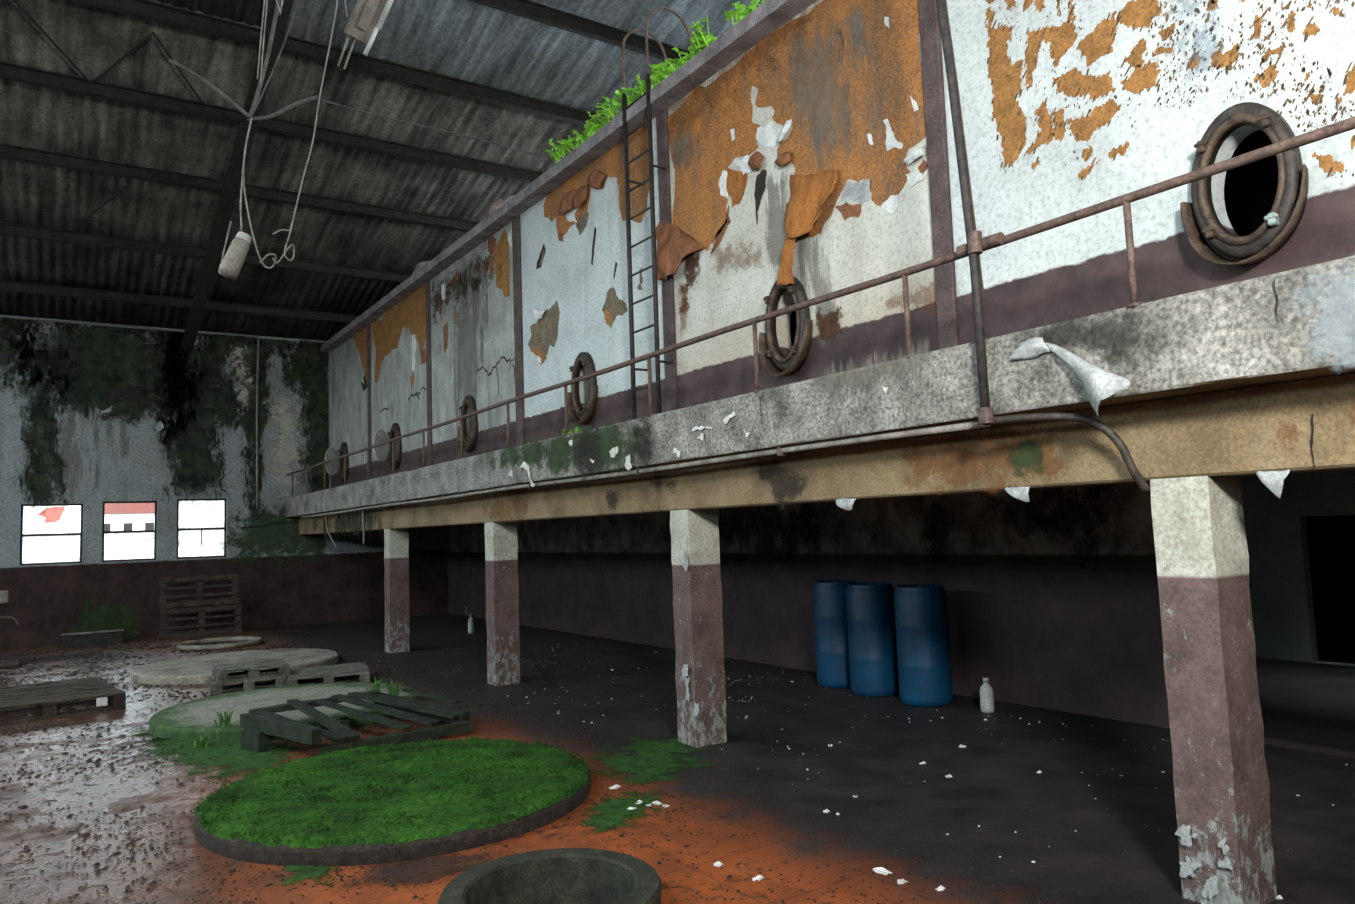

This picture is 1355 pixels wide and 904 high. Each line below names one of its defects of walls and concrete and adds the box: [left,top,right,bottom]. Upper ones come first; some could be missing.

peeling [536,0,928,290]
peeling [984,0,1355,180]
peeling [351,272,461,391]
flaking render [528,301,560,366]
flaking render [602,262,628,327]
water stain [230,343,305,499]
water stain [572,427,603,479]
peeling [1175,824,1233,899]